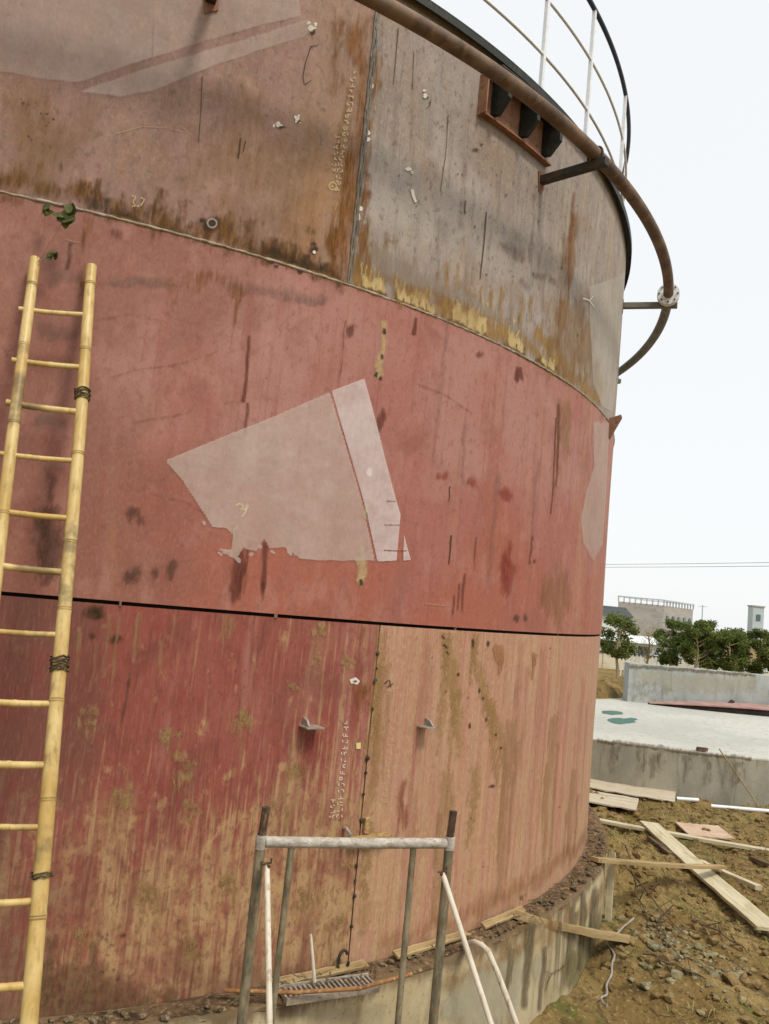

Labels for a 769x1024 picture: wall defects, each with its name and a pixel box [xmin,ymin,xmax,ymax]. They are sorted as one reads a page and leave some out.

rust [0,151,562,376]
leakage [36,510,62,582]